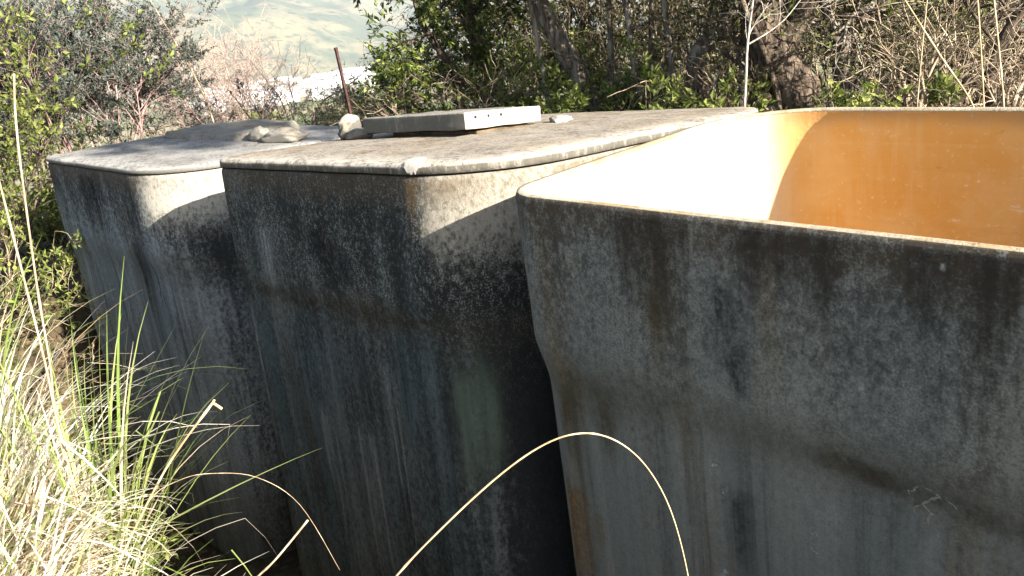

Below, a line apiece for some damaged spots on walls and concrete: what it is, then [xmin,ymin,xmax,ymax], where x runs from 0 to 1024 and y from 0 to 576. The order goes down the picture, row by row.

crack [907,487,957,522]